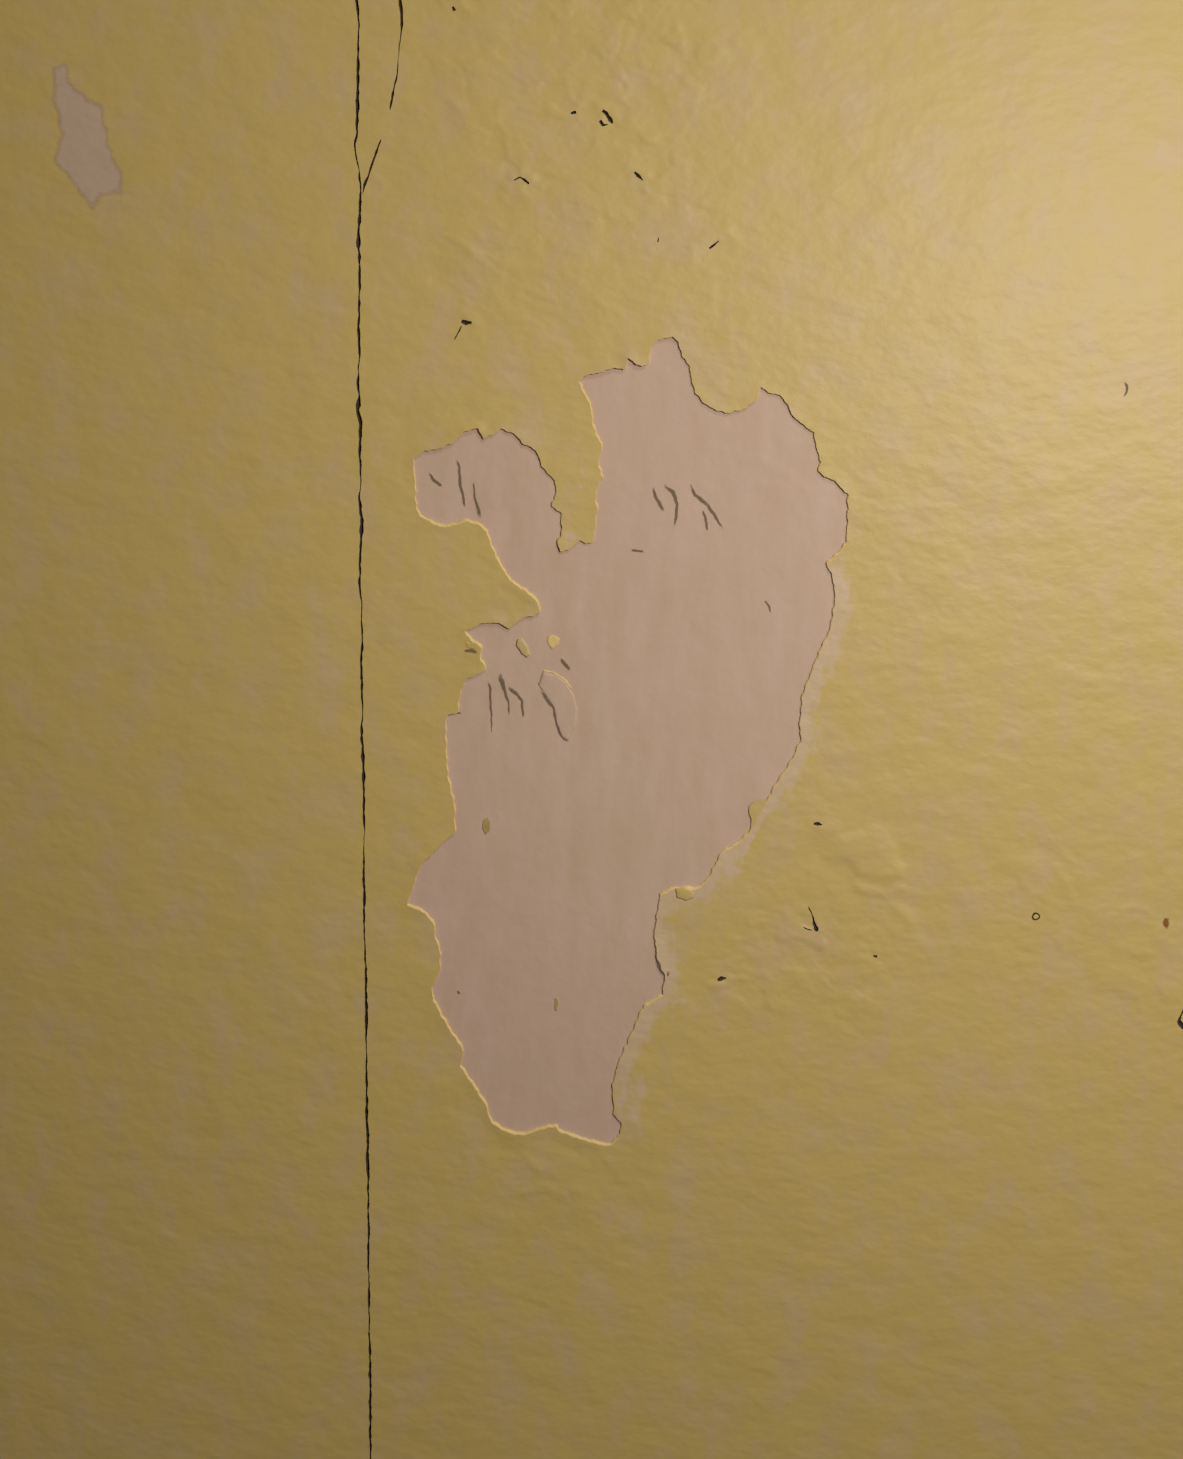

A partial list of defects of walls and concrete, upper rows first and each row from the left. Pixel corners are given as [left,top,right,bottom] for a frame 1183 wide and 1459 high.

crack [354,0,403,1459]
peeling [407,337,849,1146]